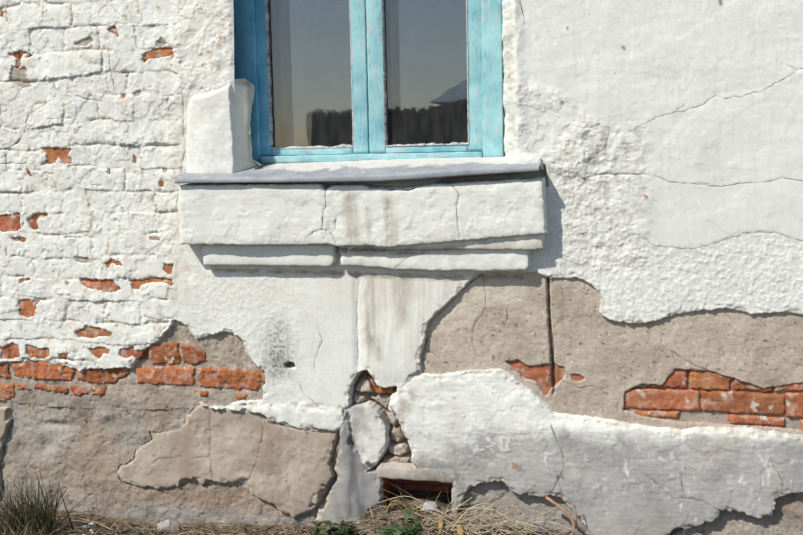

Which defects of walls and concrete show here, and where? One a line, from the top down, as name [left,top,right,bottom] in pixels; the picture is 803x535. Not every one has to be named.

peeling [9,51,32,88]
peeling [143,38,174,63]
peeling [42,147,72,165]
peeling [0,213,48,242]
peeling [81,278,121,292]
peeling [130,263,174,289]
crack [547,277,555,393]
spalling [421,272,803,434]
spalling [0,320,316,526]
spalling [353,370,412,467]
spalling [459,481,591,535]
spalling [670,492,803,535]